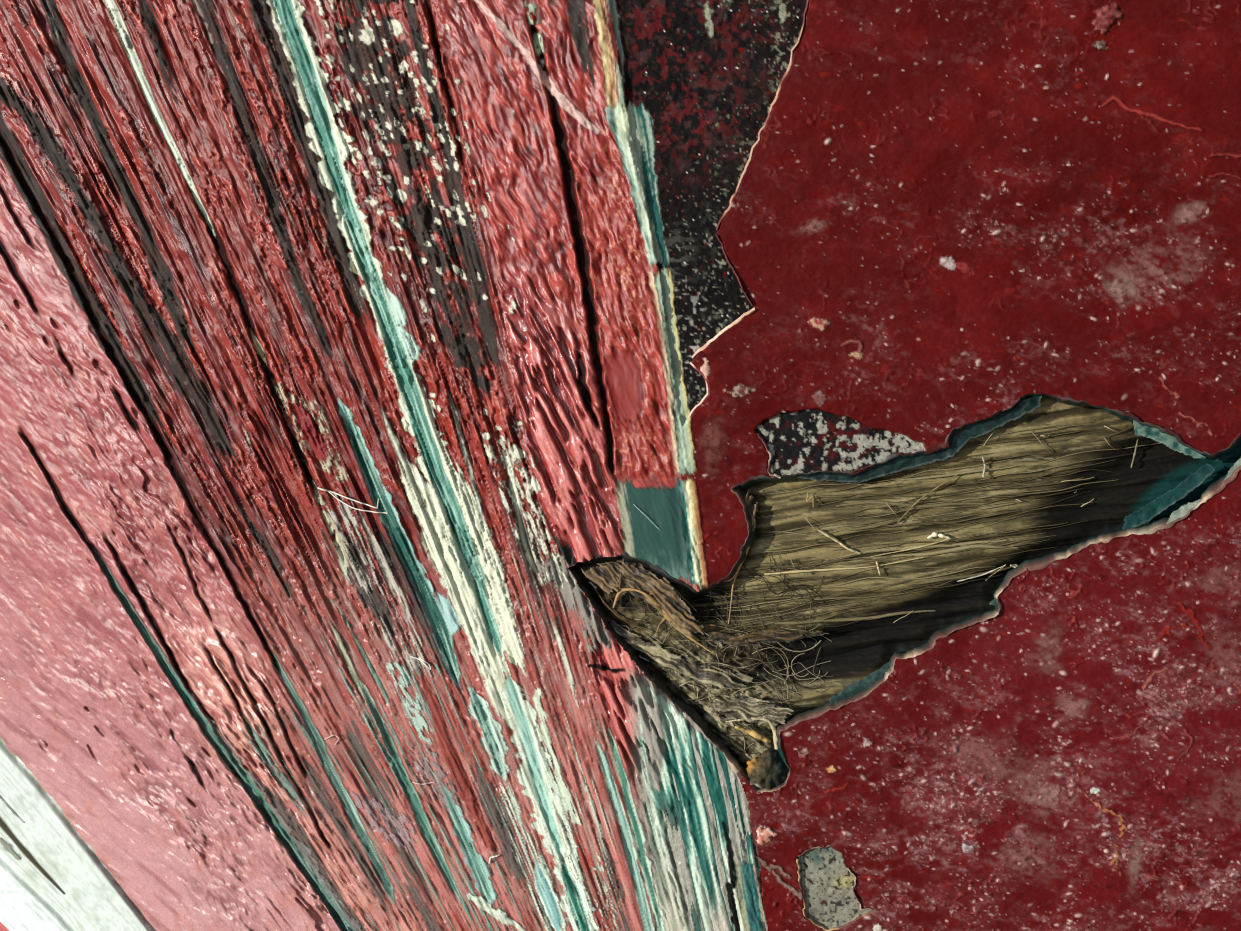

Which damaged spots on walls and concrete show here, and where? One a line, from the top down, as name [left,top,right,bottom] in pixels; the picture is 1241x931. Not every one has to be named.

crack [0,132,332,851]
peeling [276,382,460,809]
peeling [401,442,526,727]
crack [532,25,614,473]
peeling [603,350,641,424]
peeling [615,0,809,418]
spalling [489,390,1241,793]
peeling [350,791,416,856]
peeling [499,688,618,931]
peeling [734,861,765,931]
peeling [796,844,881,931]